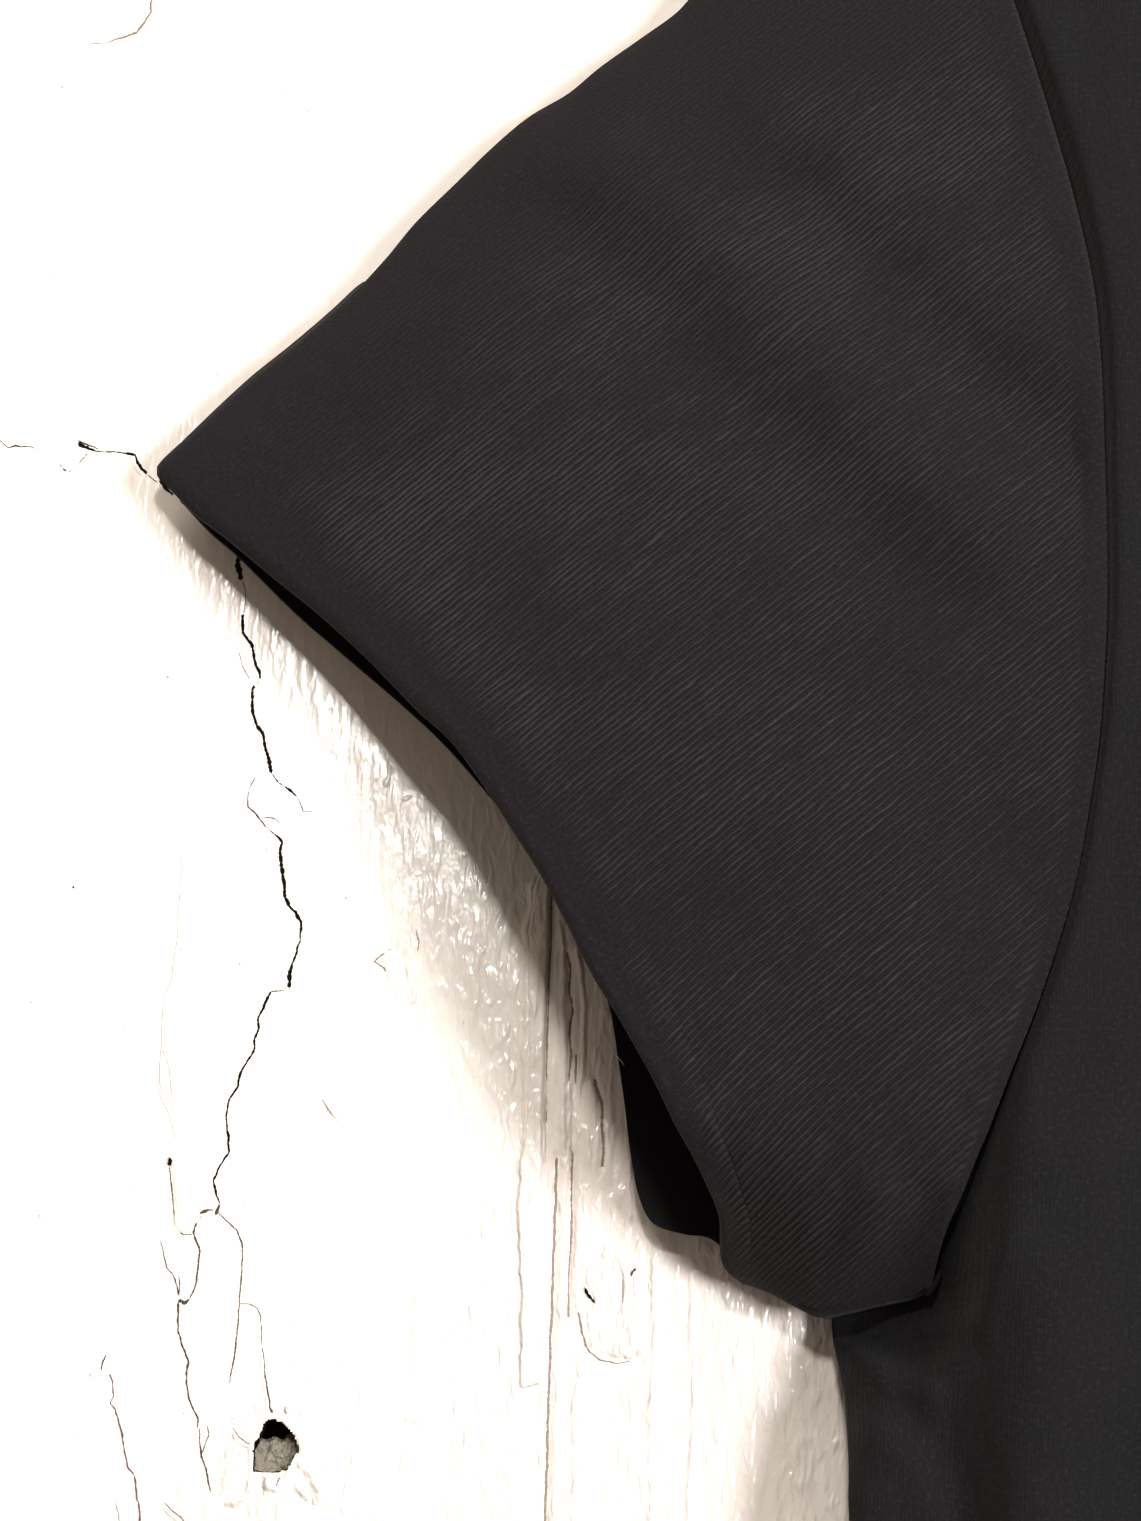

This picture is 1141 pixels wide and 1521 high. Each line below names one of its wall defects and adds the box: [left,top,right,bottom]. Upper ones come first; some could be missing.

crack [90,0,159,50]
crack [0,434,183,504]
crack [155,557,312,1493]
crack [101,1355,184,1521]
spalling [252,1404,304,1473]